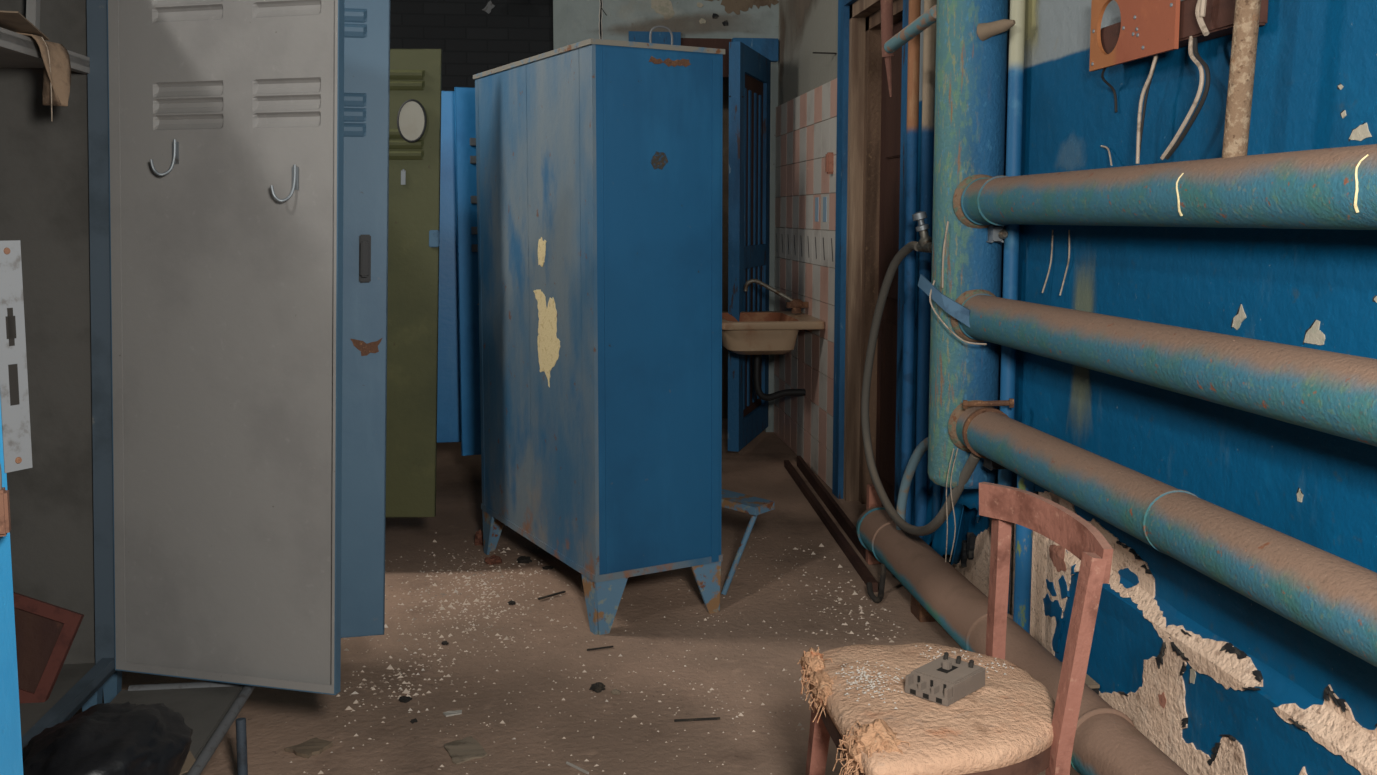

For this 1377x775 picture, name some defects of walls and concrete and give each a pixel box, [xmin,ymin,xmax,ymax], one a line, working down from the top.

peeling [697,0,779,26]
peeling [1340,110,1372,141]
peeling [1231,304,1247,330]
peeling [1303,319,1325,345]
peeling [1009,523,1081,656]
peeling [1034,491,1263,775]
peeling [1273,685,1377,775]